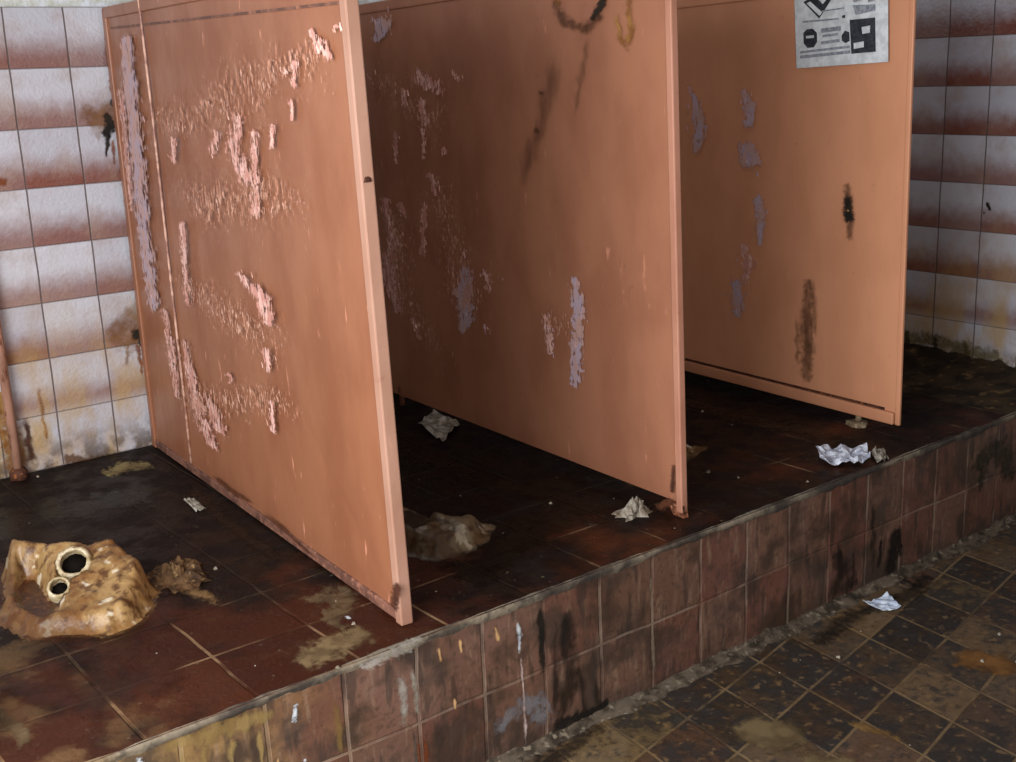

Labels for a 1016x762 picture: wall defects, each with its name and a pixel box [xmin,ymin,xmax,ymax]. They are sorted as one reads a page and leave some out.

peeling [371,7,395,42]
peeling [687,86,708,154]
peeling [117,22,342,454]
peeling [367,63,503,362]
peeling [727,192,769,318]
peeling [533,276,588,388]
water stain [904,331,1000,361]
water stain [0,490,156,542]
water stain [190,494,274,556]
water stain [537,610,558,706]